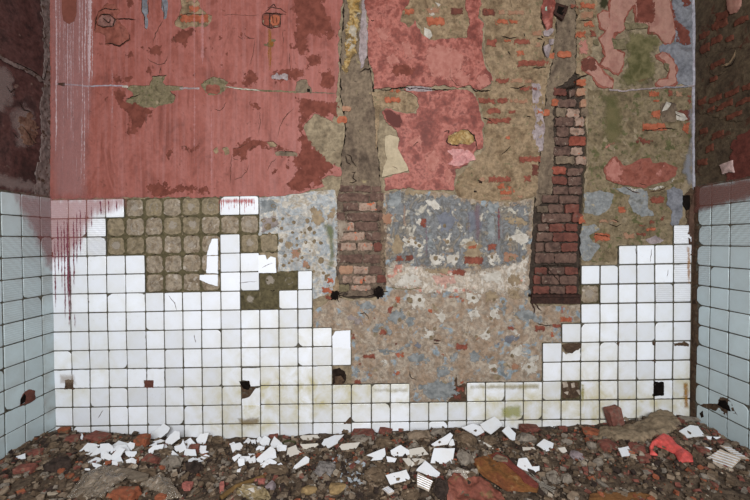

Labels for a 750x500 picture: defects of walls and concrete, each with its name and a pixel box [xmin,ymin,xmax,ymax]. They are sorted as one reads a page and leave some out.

leakage [55,0,93,135]
crack [375,69,489,92]
spalling [100,0,446,389]
spalling [401,0,750,447]
spalling [5,389,44,434]
spalling [239,368,260,406]